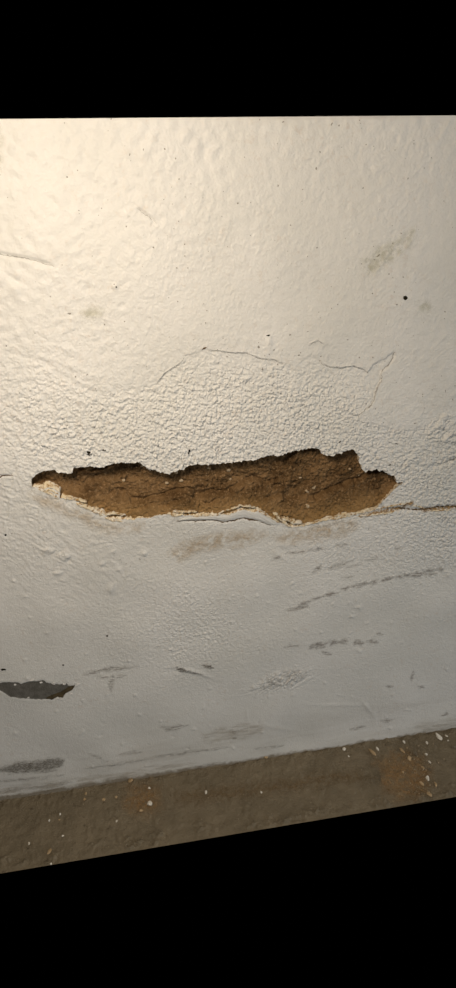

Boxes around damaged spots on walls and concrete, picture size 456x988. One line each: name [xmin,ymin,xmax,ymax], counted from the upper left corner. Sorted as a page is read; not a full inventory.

spalling [31,441,411,527]
crack [399,502,456,512]
peeling [0,669,80,700]